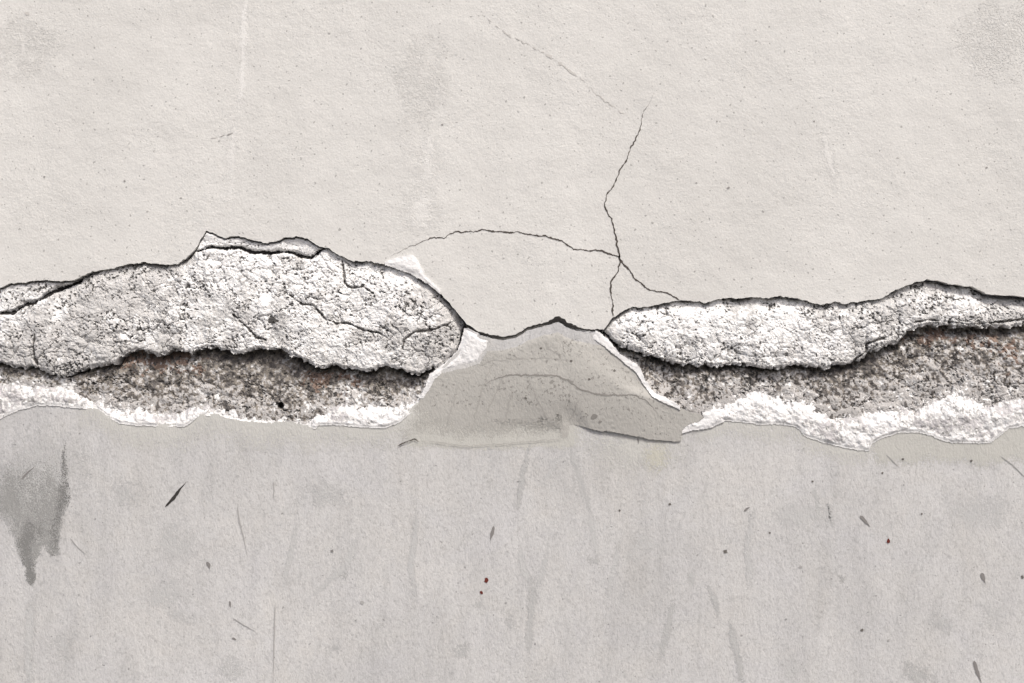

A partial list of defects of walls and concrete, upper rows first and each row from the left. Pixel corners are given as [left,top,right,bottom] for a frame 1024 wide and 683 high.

spalling [0,232,492,429]
crack [289,18,679,412]
spalling [576,280,1024,451]
leakage [0,403,1024,683]